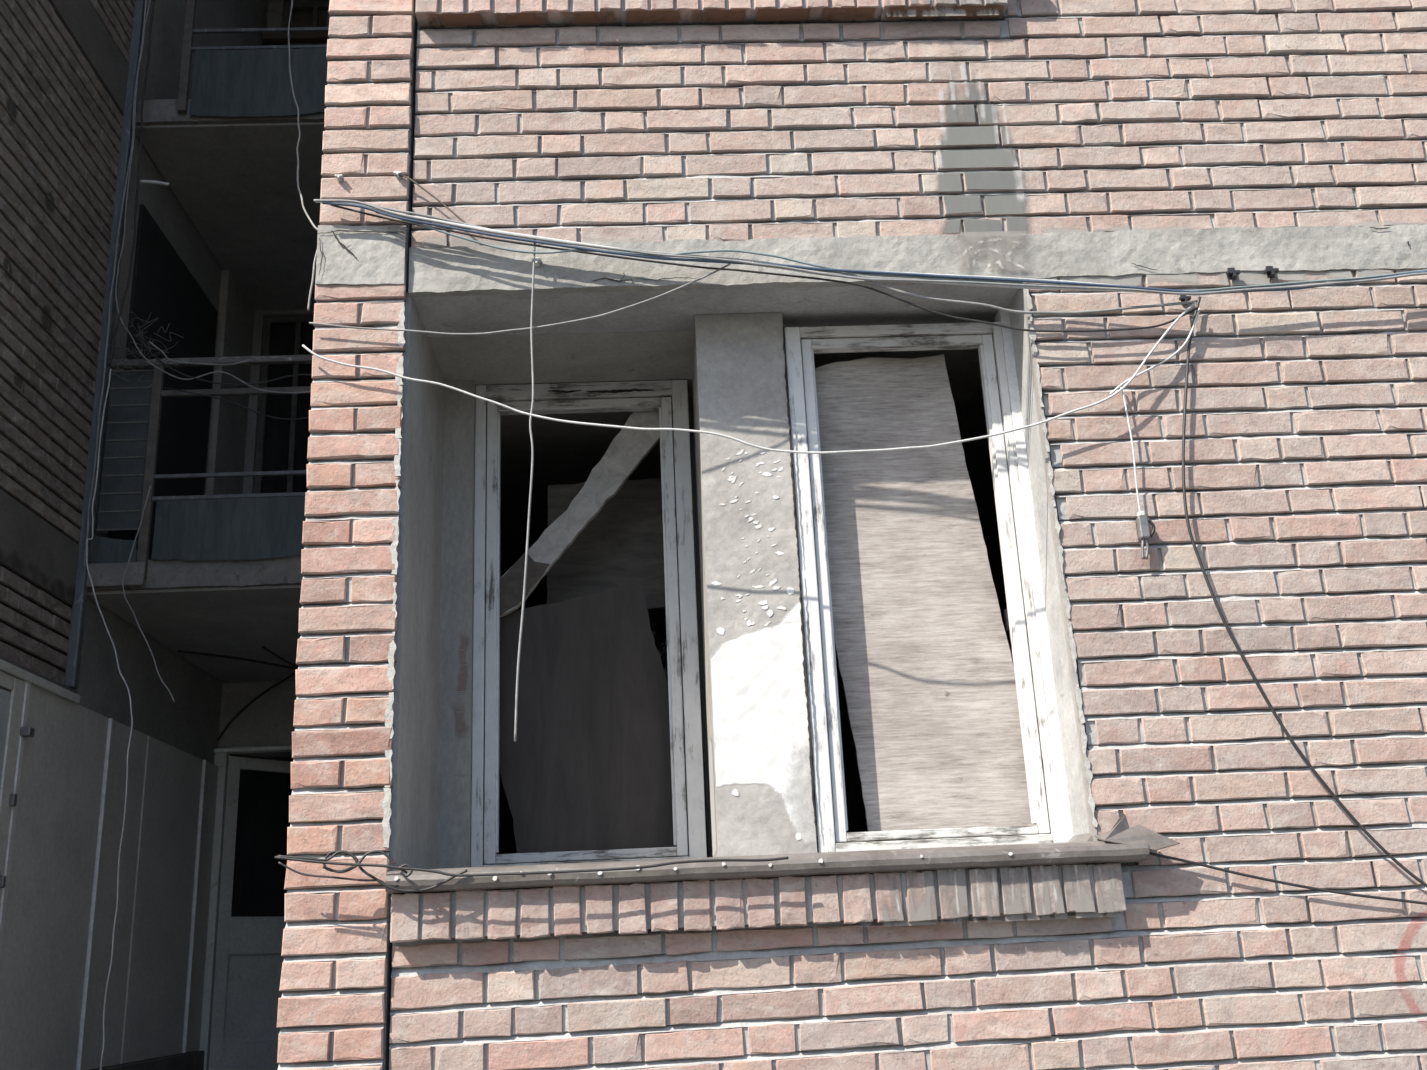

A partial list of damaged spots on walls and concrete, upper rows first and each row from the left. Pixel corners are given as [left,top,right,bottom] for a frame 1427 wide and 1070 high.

leakage [938,82,1030,271]
peeling [711,449,814,842]